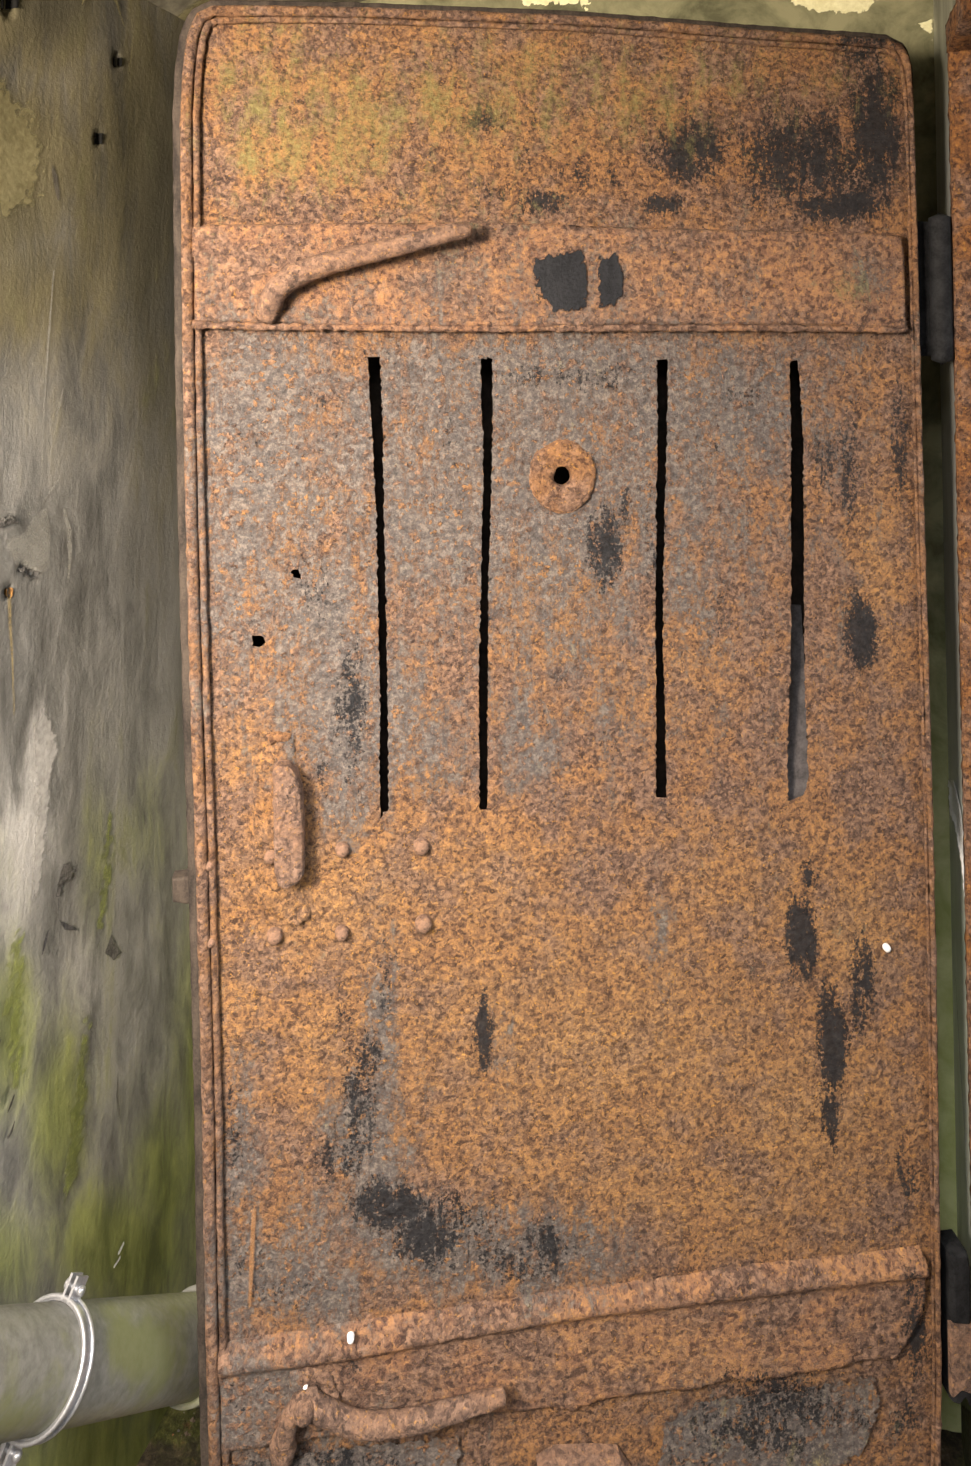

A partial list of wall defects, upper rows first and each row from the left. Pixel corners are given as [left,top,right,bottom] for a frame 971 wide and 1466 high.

peeling [522,0,591,11]
peeling [791,0,874,15]